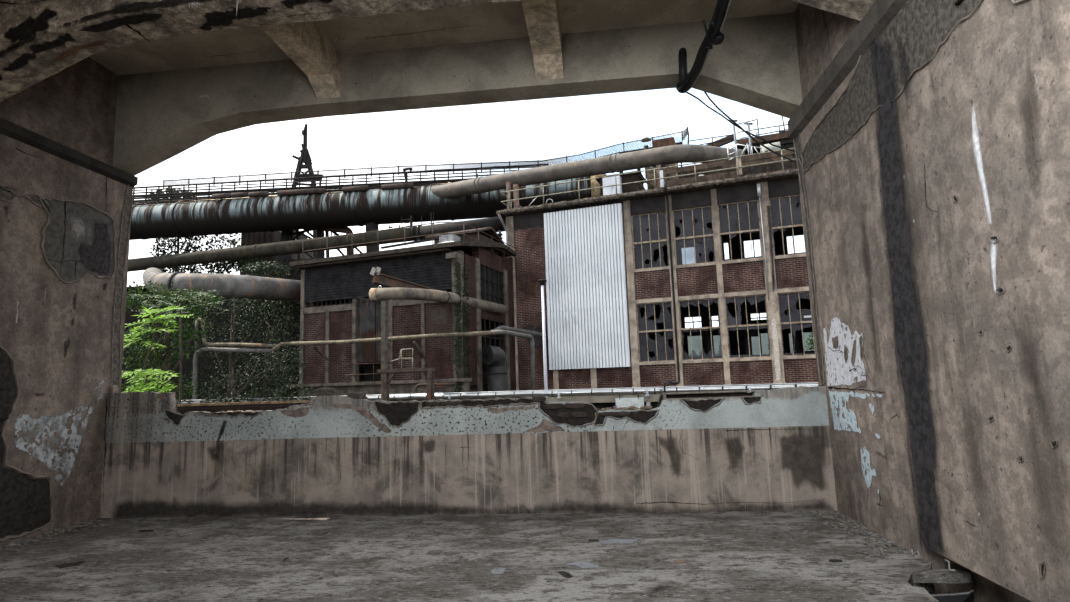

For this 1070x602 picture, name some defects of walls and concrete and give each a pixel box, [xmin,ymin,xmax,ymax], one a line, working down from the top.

flaking render [0,183,134,542]
flaking render [330,396,660,433]
flaking render [679,397,725,413]
damp [660,438,680,474]
damp [727,438,742,466]
peeling [860,447,879,494]